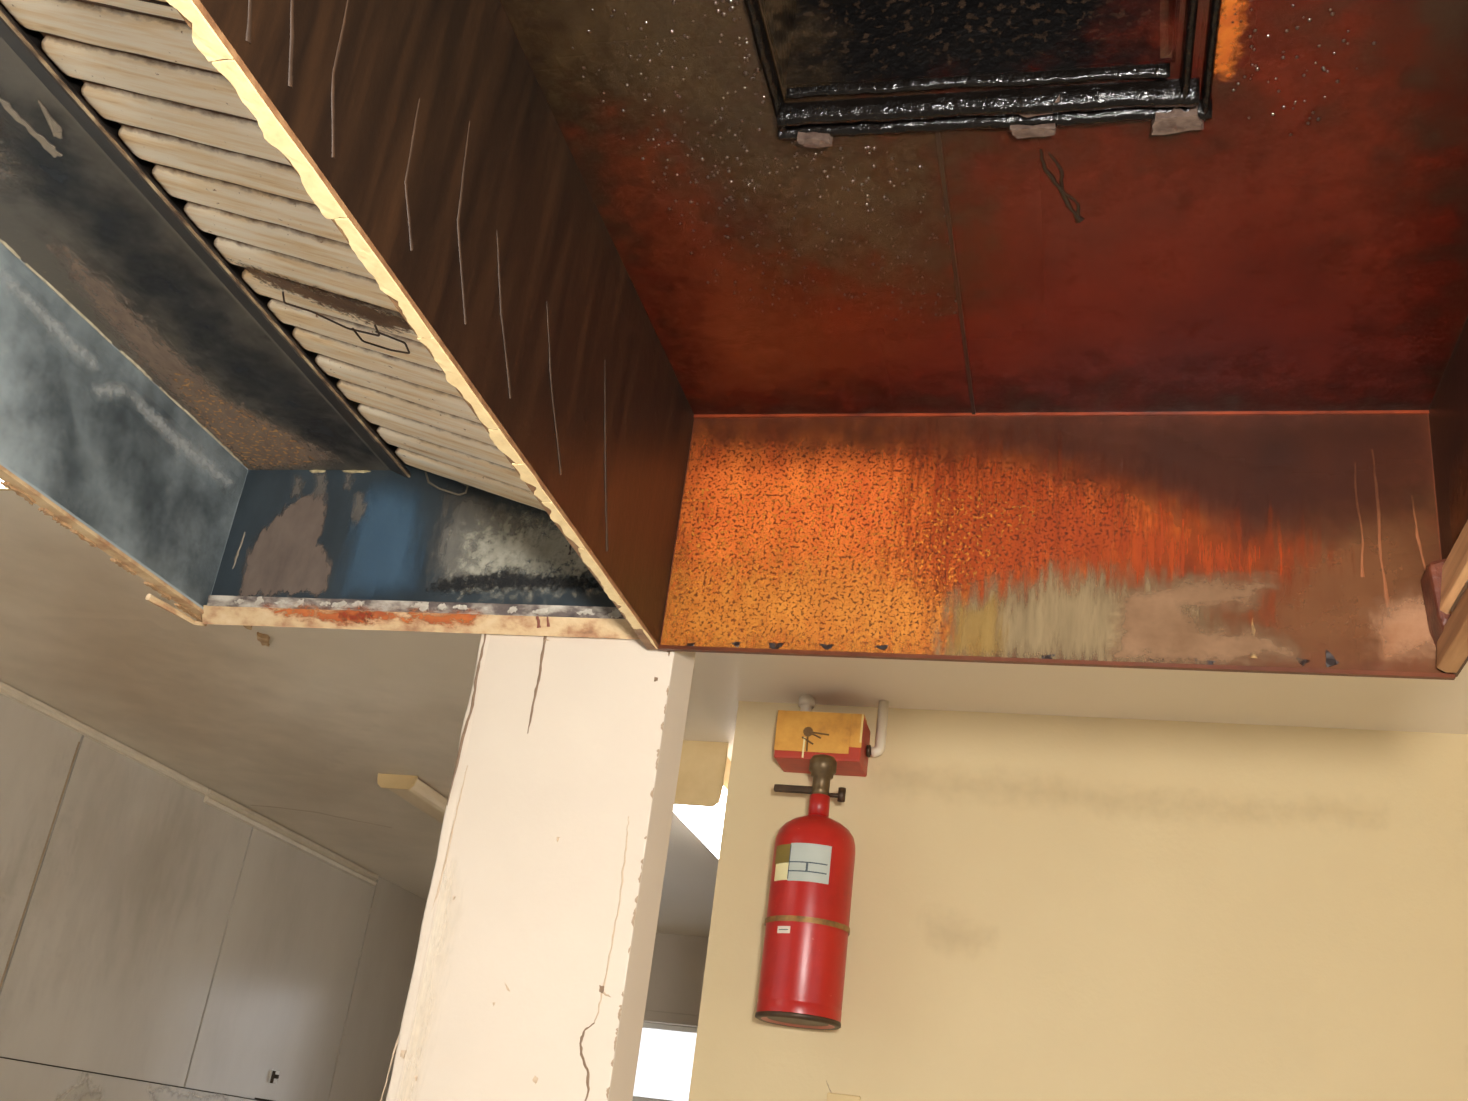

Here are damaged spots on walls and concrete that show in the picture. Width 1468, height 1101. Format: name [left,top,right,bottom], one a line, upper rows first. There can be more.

peeling [0,98,63,158]
peeling [0,239,242,464]
peeling [166,0,671,656]
peeling [110,558,207,627]
corrosion [262,605,481,626]
crack [527,636,550,733]
crack [579,816,629,1101]